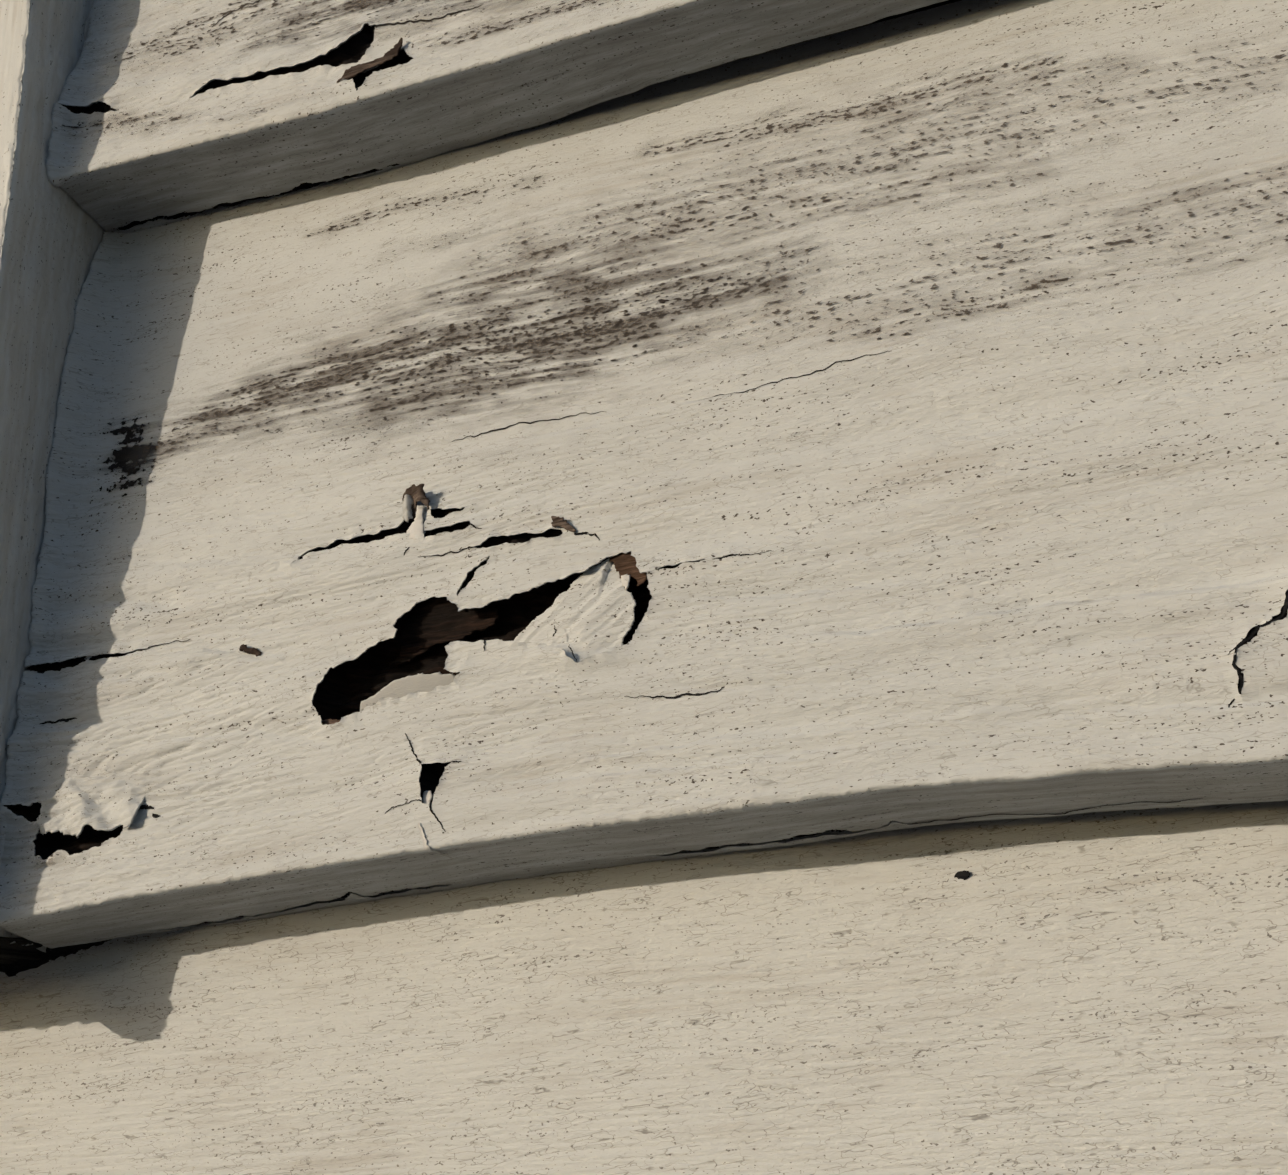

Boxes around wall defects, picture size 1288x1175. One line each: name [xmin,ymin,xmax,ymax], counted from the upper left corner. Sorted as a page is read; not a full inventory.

leakage [109,0,619,63]
peeling [337,38,414,91]
mould [62,110,197,136]
leakage [90,27,1288,506]
crack [25,639,190,674]
peeling [312,551,661,725]
crack [1228,590,1288,708]
peeling [3,766,160,865]
peeling [385,733,461,832]